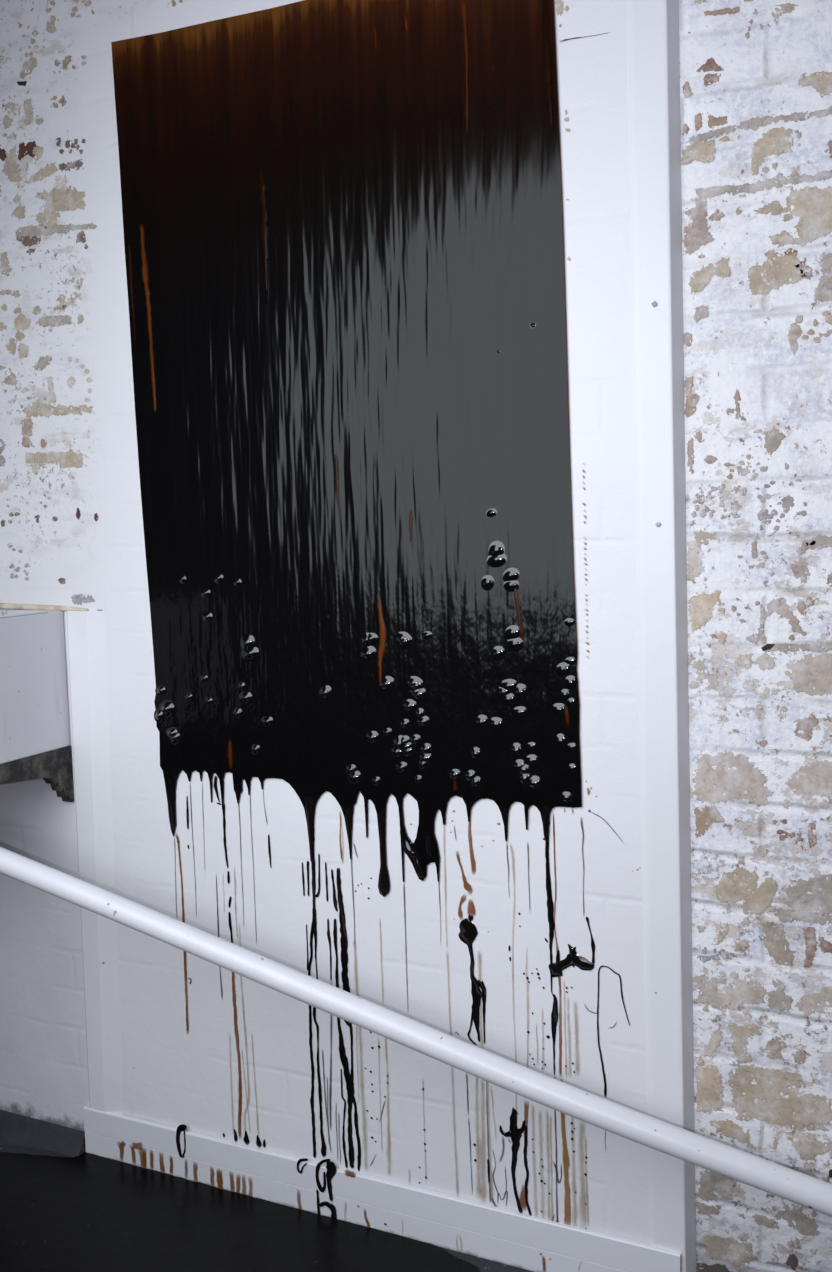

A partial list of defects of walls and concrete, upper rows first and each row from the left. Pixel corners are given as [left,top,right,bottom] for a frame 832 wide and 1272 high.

peeling [3,0,94,129]
peeling [682,58,724,98]
peeling [693,0,798,39]
peeling [0,138,97,255]
peeling [681,71,832,355]
peeling [0,251,93,470]
peeling [686,389,809,581]
peeling [791,535,832,583]
peeling [688,590,832,743]
peeling [692,750,832,848]
peeling [693,867,832,1163]
peeling [696,1205,820,1272]